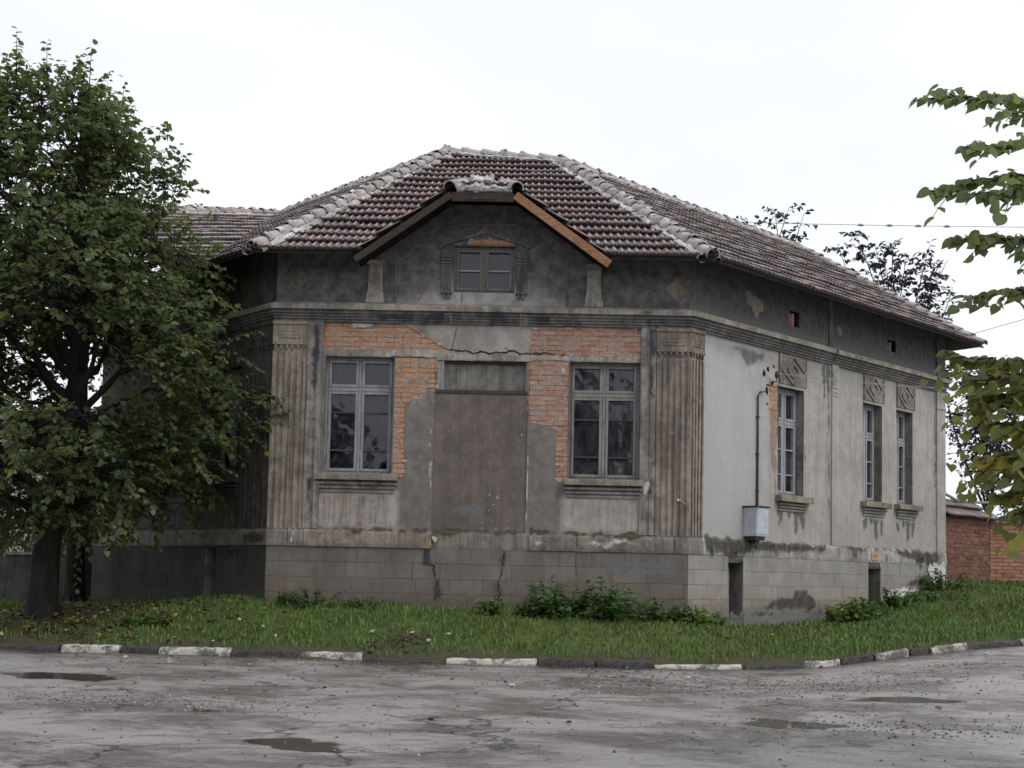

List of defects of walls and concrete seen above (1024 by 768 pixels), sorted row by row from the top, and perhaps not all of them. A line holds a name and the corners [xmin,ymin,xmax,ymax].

flaking render [467,237,515,246]
crack [447,297,554,355]
peeling [746,291,764,322]
flaking render [324,322,447,480]
flaking render [527,327,642,483]
damp [705,535,825,556]
damp [896,522,939,567]